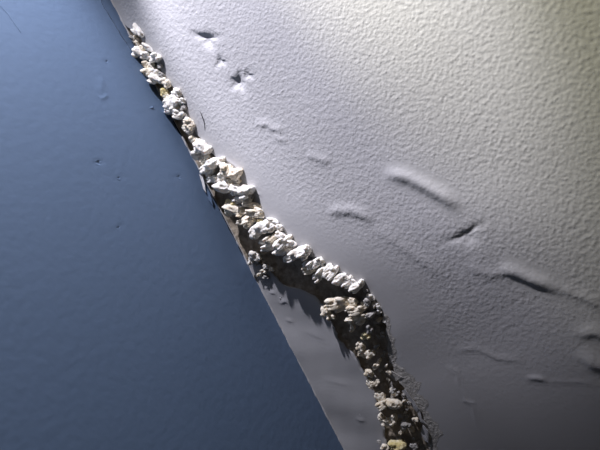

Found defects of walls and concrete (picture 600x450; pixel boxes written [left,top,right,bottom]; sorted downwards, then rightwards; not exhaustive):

crack [217,153,263,197]
leakage [130,23,418,450]